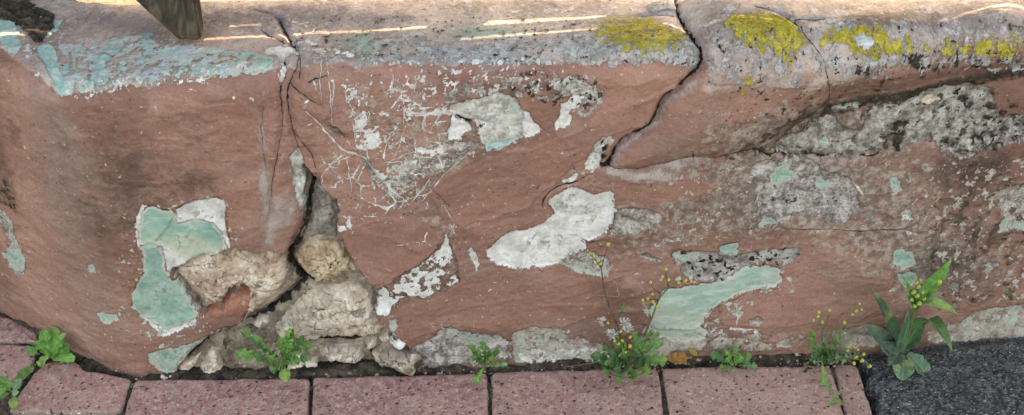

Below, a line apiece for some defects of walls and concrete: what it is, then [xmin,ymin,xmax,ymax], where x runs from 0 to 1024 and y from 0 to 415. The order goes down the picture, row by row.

peeling [0,8,274,100]
crack [305,329,382,358]
spalling [97,147,609,377]
crack [244,9,482,320]
peeling [341,64,607,212]
crack [542,0,879,208]
spalling [468,82,1024,357]